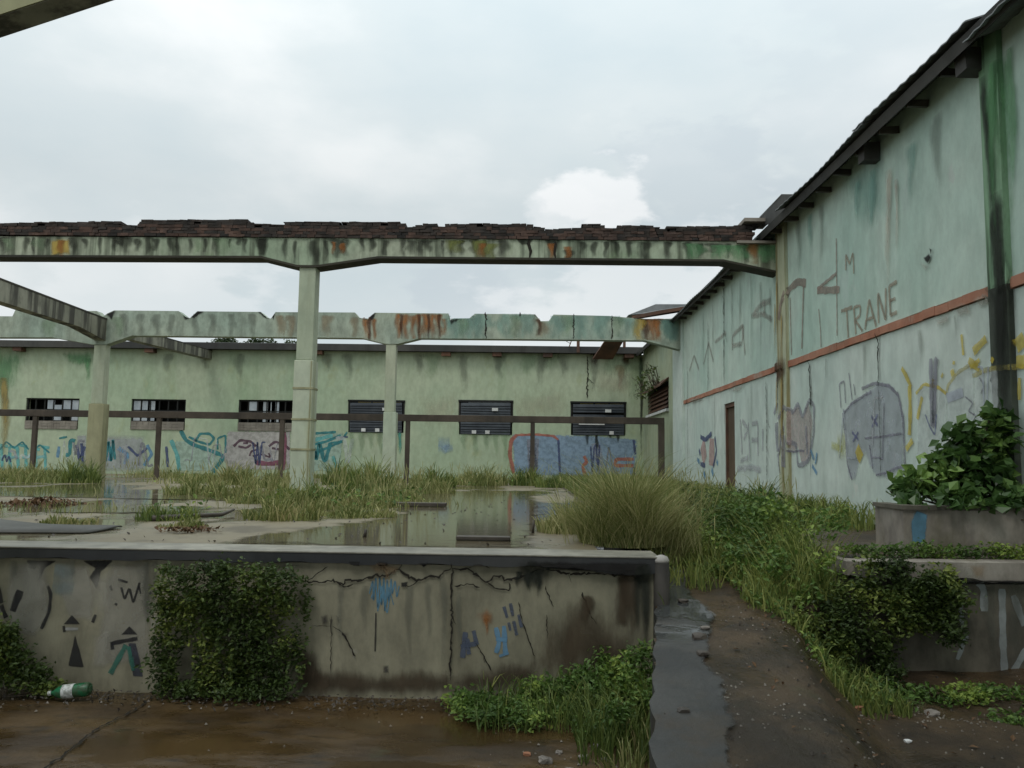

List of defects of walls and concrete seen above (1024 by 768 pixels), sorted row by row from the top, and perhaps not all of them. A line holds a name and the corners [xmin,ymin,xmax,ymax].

damp [980,50,1016,399]
rust [52,240,69,254]
damp [69,237,266,255]
damp [310,238,388,260]
rust [363,317,376,338]
rust [396,314,447,335]
crack [572,314,594,397]
damp [516,564,549,590]
damp [617,564,651,638]
crack [304,563,635,680]
damp [547,596,630,673]